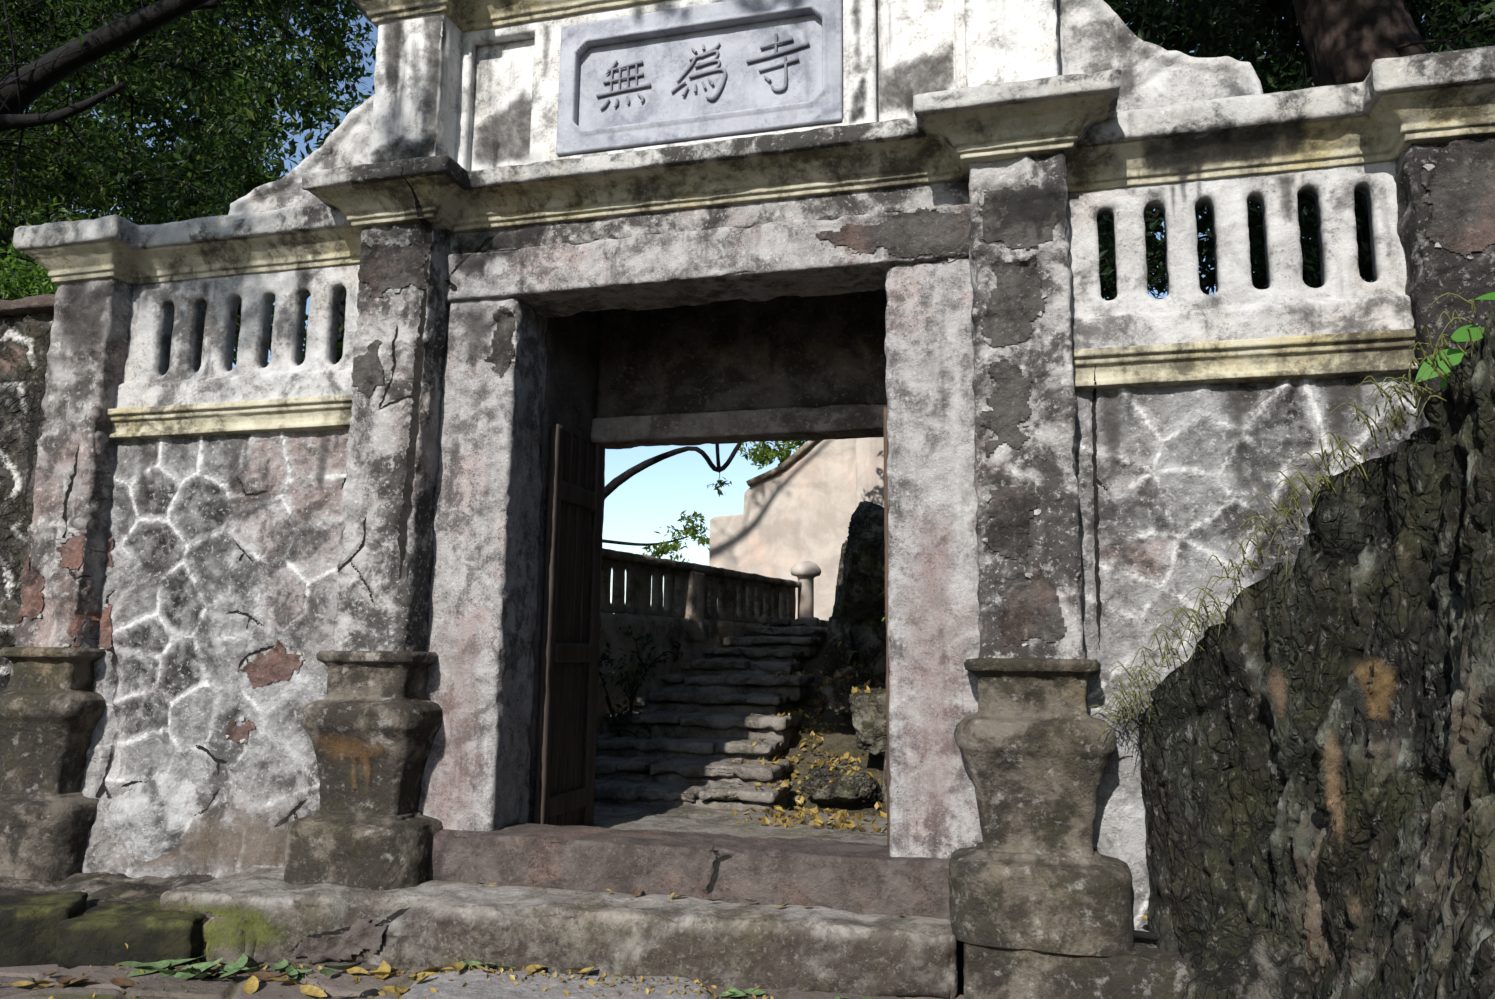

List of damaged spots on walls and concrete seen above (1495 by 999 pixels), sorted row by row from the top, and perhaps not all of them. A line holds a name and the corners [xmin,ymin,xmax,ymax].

crack [338,167,497,607]
crack [1091,365,1108,650]
spalling [56,532,114,570]
spalling [16,557,45,623]
spalling [62,604,112,650]
crack [60,446,147,799]
spalling [238,639,305,688]
spalling [224,716,255,744]
crack [194,745,227,816]
crack [706,846,732,894]